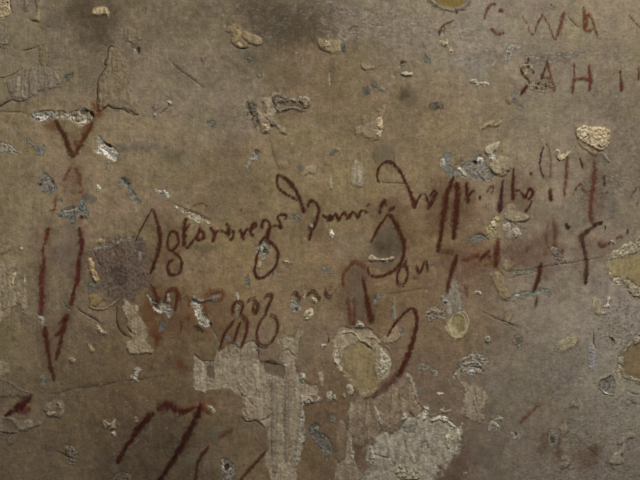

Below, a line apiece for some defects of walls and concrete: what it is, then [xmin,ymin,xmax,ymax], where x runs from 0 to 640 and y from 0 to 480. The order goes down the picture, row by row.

flaking render [30,107,95,127]
peeling [246,92,311,135]
flaking render [95,135,119,170]
flaking render [440,141,512,182]
flaking render [576,125,611,171]
flaking render [606,235,640,299]
flaking render [423,267,470,340]
flaking render [190,291,504,480]
flaking render [598,329,640,396]